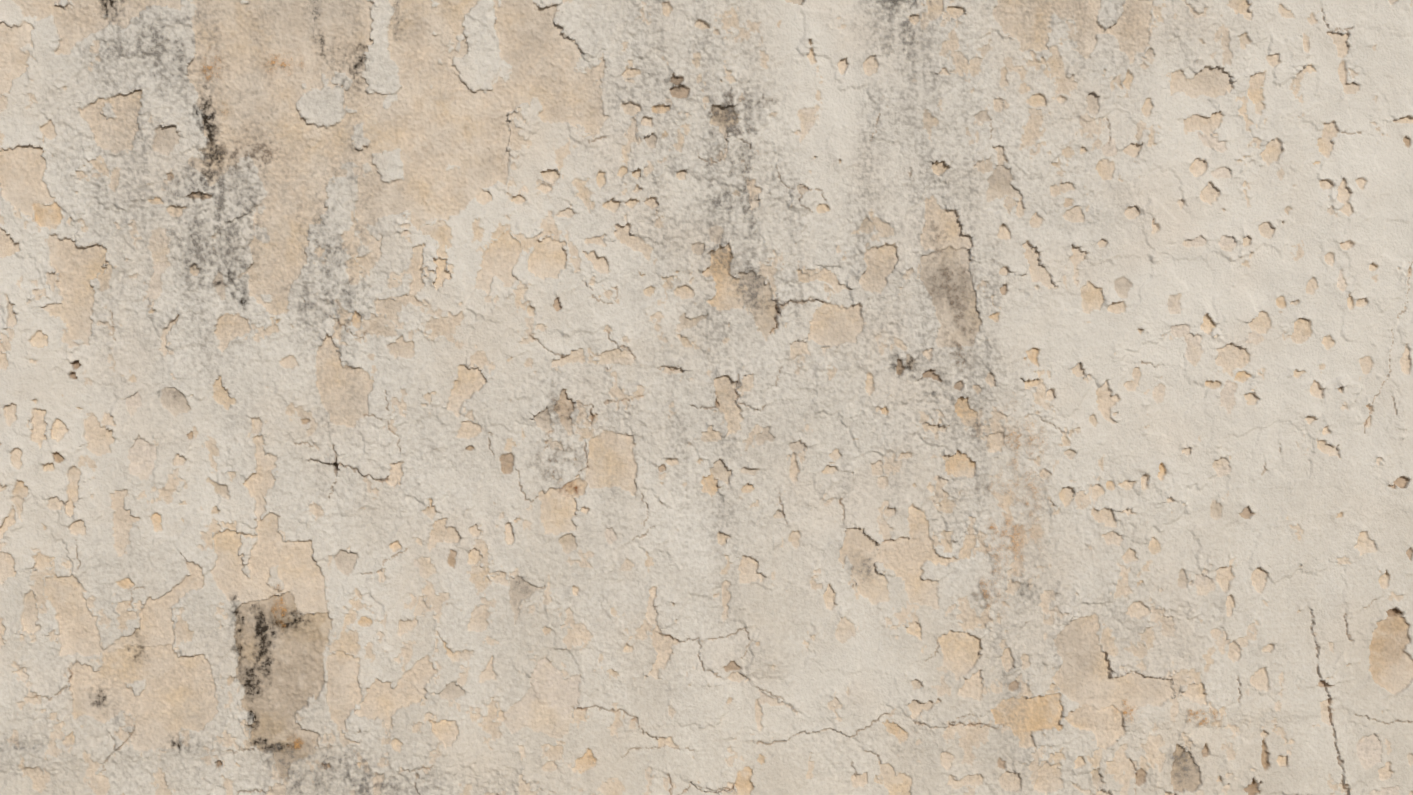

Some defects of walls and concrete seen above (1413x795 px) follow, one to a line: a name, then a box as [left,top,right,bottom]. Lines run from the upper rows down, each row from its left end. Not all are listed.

water stain [120,26,184,76]
water stain [175,96,271,306]
peeling [909,0,1284,223]
peeling [1279,4,1367,217]
spalling [1371,116,1413,147]
peeling [1162,277,1348,413]
peeling [0,354,507,795]
water stain [233,595,310,763]
peeling [389,326,644,678]
peeling [611,587,686,679]
peeling [1346,570,1413,696]
spalling [1388,476,1410,488]